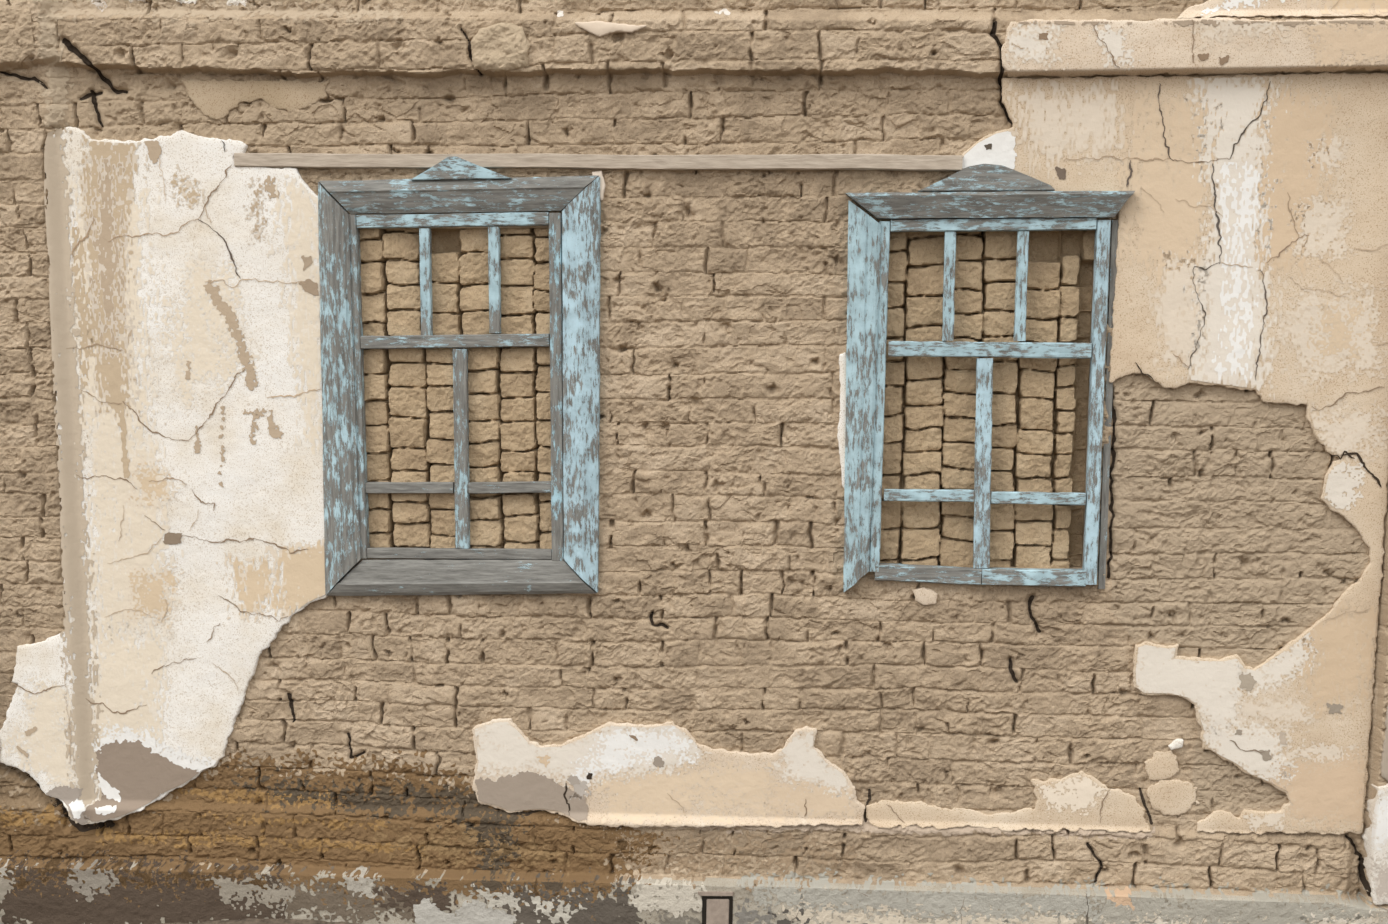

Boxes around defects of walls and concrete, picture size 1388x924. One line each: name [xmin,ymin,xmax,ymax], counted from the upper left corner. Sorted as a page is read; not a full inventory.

peeling [962,20,1141,180]
crack [72,141,306,288]
leakage [241,174,323,463]
crack [1066,81,1387,382]
leakage [0,127,267,806]
leakage [214,528,325,623]
crack [1107,397,1117,578]
spalling [1110,0,1388,864]
crack [1330,451,1381,487]
spalling [46,723,216,824]
spalling [475,722,712,829]
leakage [0,747,1376,924]